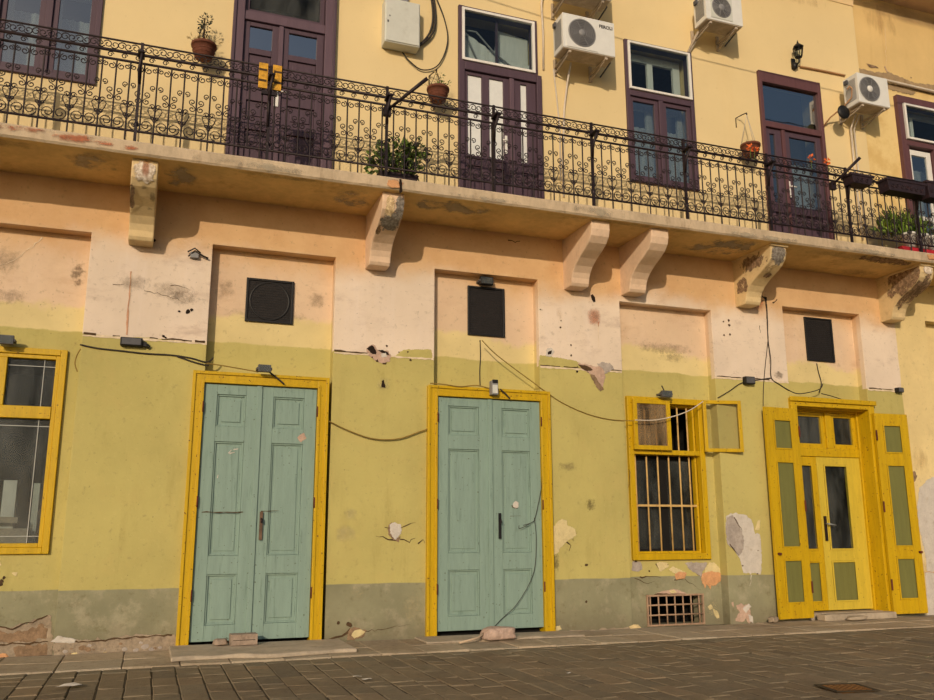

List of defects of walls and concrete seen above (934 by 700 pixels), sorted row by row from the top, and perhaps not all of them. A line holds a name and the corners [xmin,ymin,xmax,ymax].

peeling [376,179,404,234]
peeling [737,246,786,294]
spalling [888,266,933,311]
peeling [377,522,424,544]
peeling [553,519,576,555]
peeling [725,513,762,584]
peeling [913,471,934,615]
peeling [632,560,721,595]
flaking render [0,615,176,658]
flaking render [330,621,395,640]